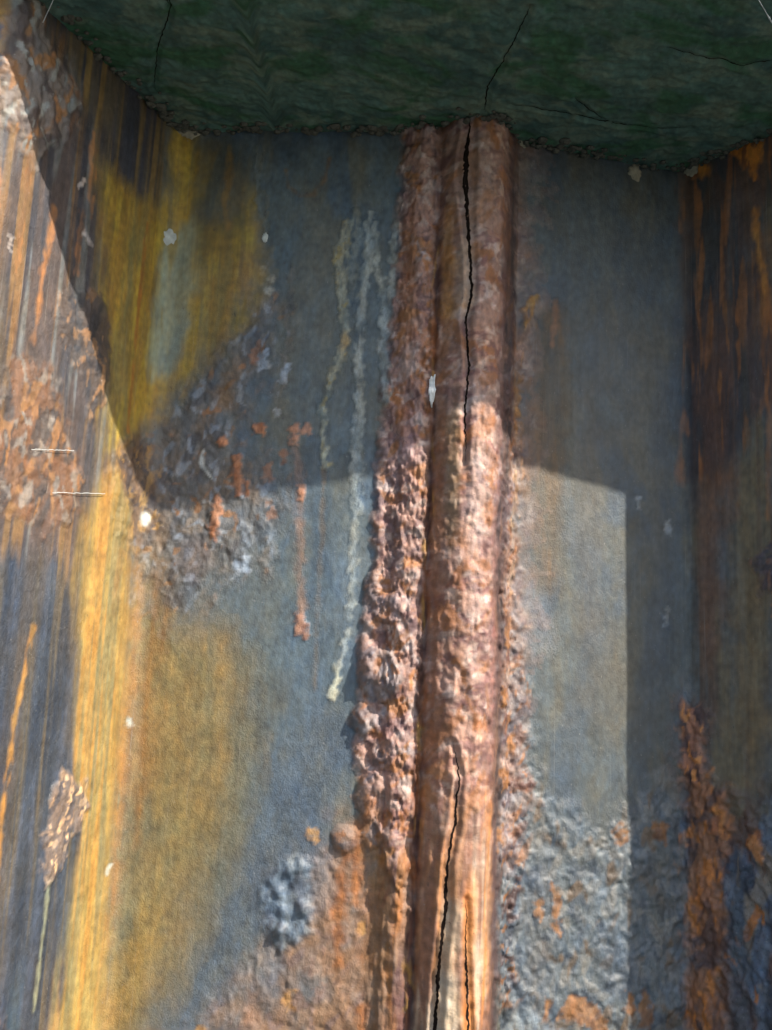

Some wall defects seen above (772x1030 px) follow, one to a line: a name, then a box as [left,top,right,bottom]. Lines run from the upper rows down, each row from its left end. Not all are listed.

corrosion [671,135,772,488]
corrosion [0,9,280,1030]
corrosion [259,421,314,641]
corrosion [326,128,526,1030]
corrosion [302,825,322,847]
crack [433,745,470,1030]
corrosion [531,879,564,941]
corrosion [542,986,656,1030]
corrosion [609,819,631,848]
corrosion [650,695,766,1030]